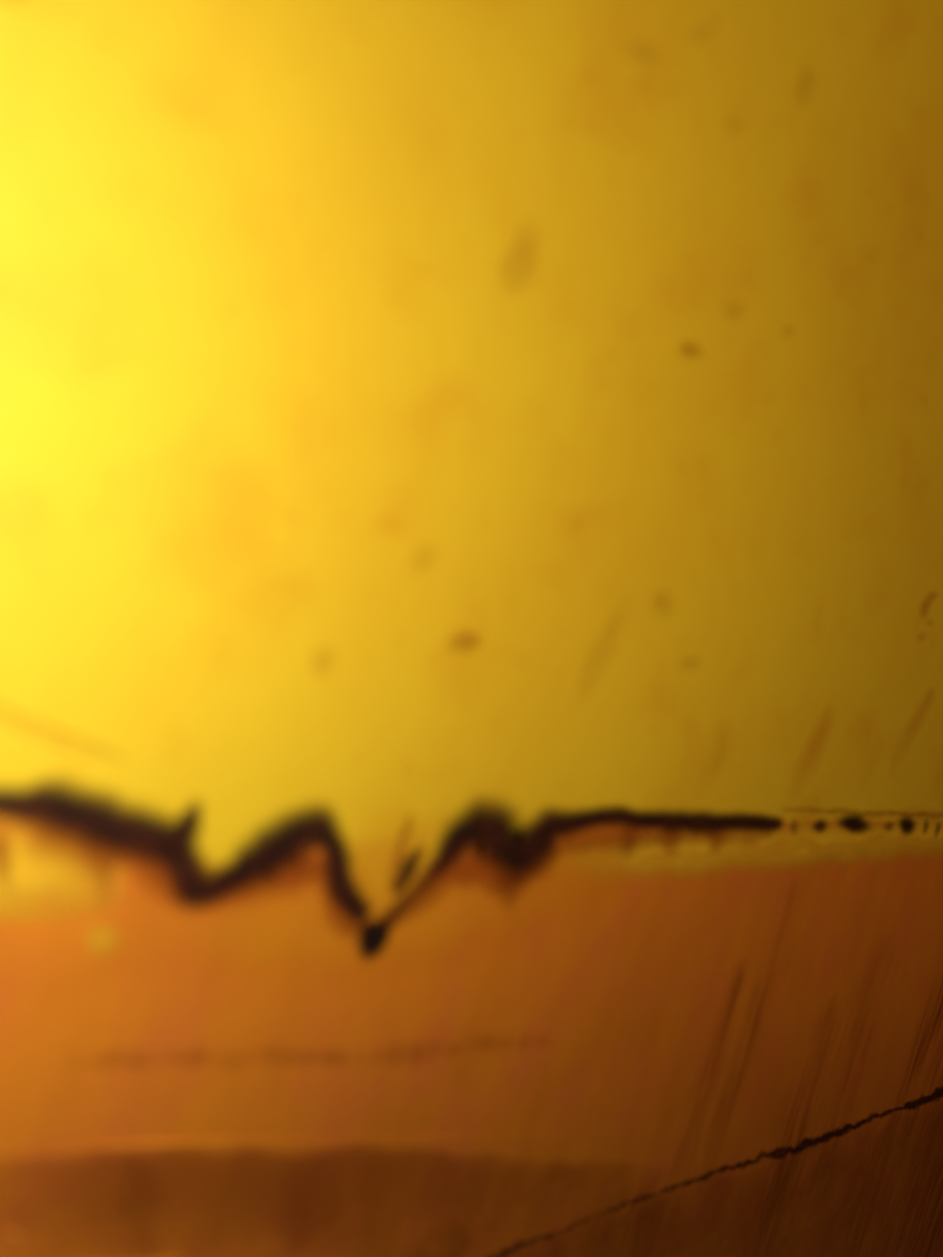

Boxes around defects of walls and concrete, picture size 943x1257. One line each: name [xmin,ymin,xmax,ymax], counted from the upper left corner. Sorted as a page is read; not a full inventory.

crack [0,785,782,957]
crack [815,816,867,832]
crack [901,819,914,833]
crack [493,1088,943,1257]